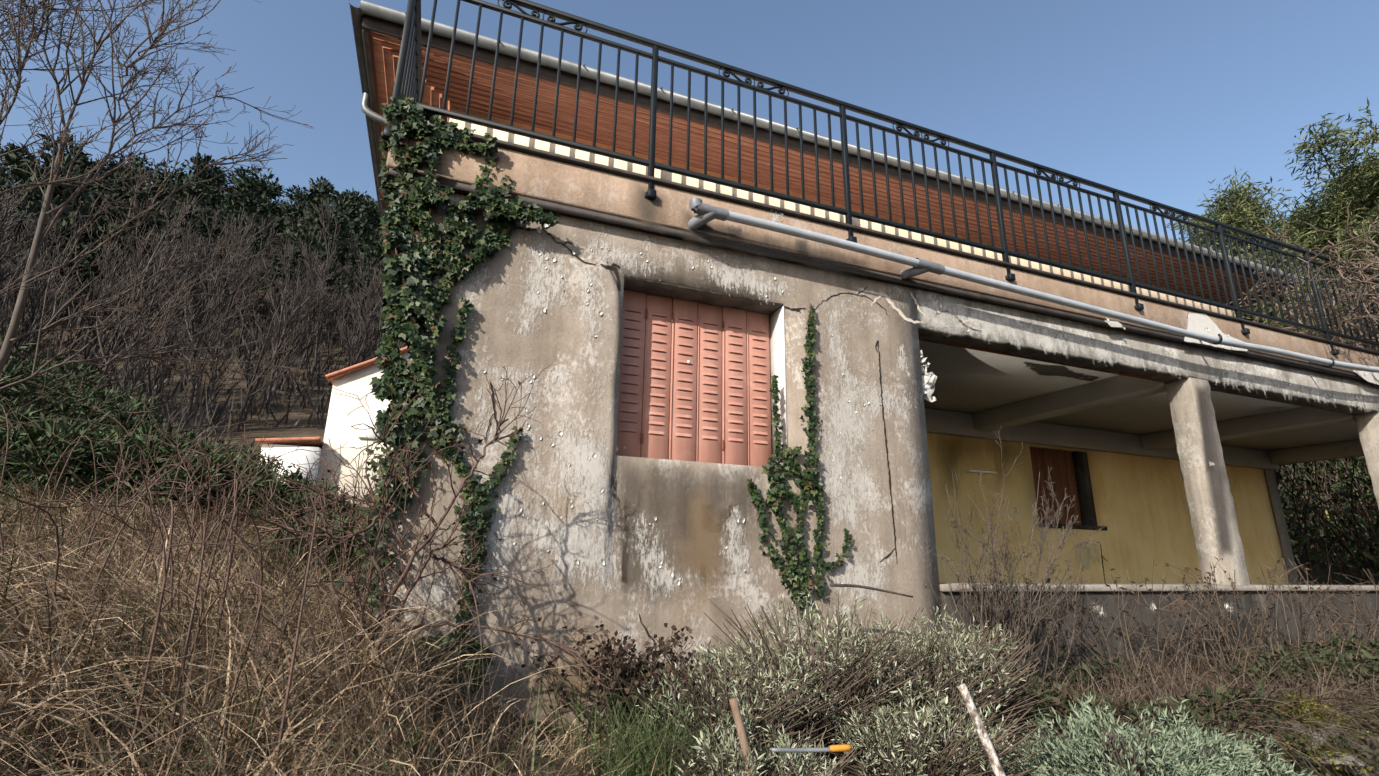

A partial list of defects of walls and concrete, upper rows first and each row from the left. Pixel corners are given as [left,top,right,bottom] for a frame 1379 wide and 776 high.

crack [516,221,621,291]
crack [784,286,981,562]
water stain [632,476,748,585]